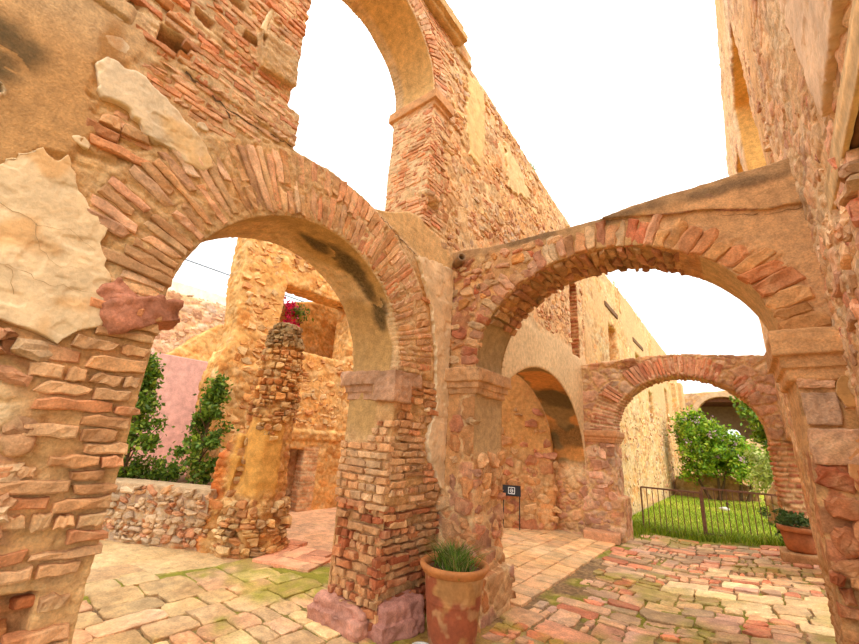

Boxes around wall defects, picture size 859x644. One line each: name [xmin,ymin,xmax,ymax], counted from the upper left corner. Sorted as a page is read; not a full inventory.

flaking render [72,135,90,150]
crack [1,203,93,294]
flaking render [0,147,111,344]